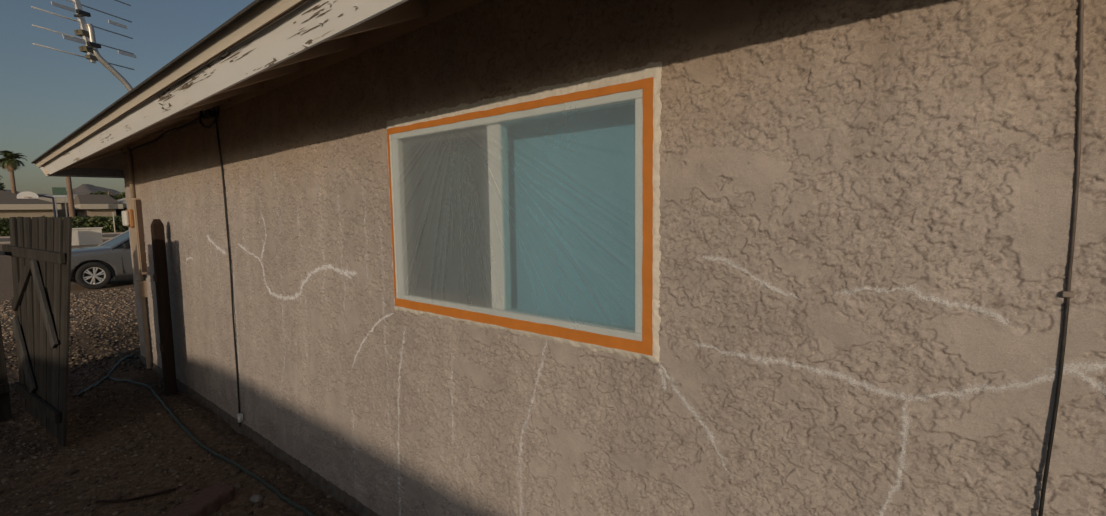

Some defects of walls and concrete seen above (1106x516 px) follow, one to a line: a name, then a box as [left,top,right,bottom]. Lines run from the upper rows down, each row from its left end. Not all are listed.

peeling [156,36,259,111]
peeling [289,1,343,55]
crack [186,217,358,445]
crack [703,255,798,299]
crack [832,285,1008,326]
crack [352,313,406,516]
crack [518,340,547,516]
crack [658,365,727,471]
crack [694,343,1106,516]